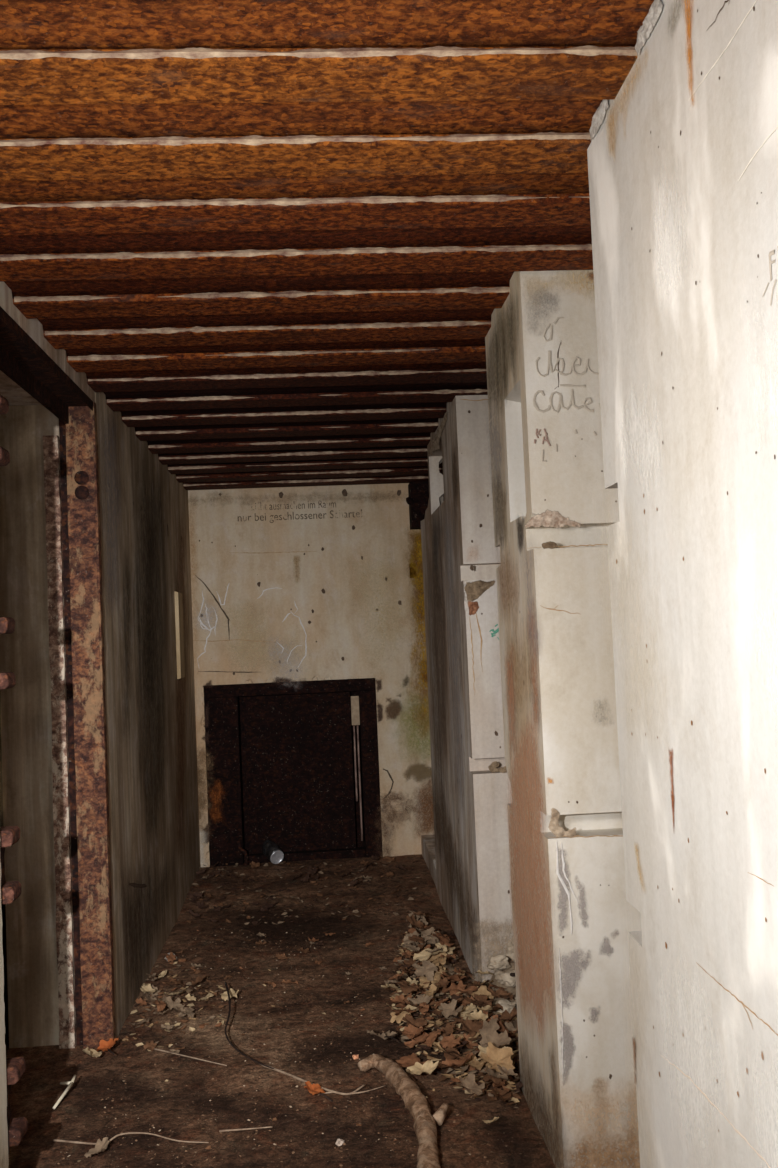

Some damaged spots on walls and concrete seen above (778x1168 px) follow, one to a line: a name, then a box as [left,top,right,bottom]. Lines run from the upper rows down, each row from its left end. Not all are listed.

water stain [45,287,516,400]
water stain [122,409,457,496]
water stain [490,429,523,548]
spalling [525,499,580,528]
water stain [404,529,446,761]
spalling [464,565,503,615]
water stain [380,780,514,979]
water stain [556,842,578,935]
peeling [549,801,588,938]
peeling [561,951,589,1006]
peeling [561,1024,587,1079]
water stain [521,949,640,1168]